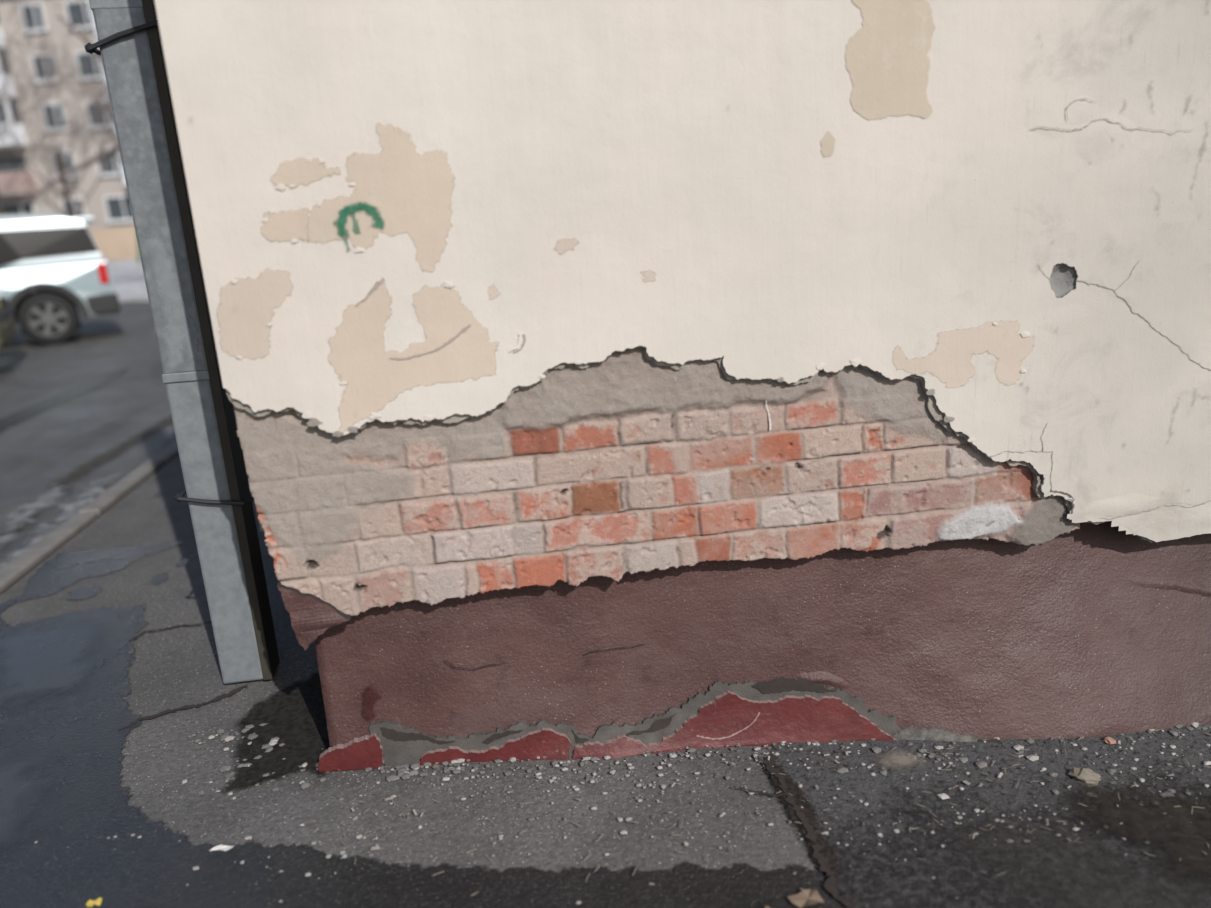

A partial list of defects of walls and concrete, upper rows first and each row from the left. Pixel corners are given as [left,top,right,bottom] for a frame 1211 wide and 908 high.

peeling [845,0,936,120]
spalling [216,123,1106,616]
crack [1038,261,1211,371]
peeling [318,677,903,775]